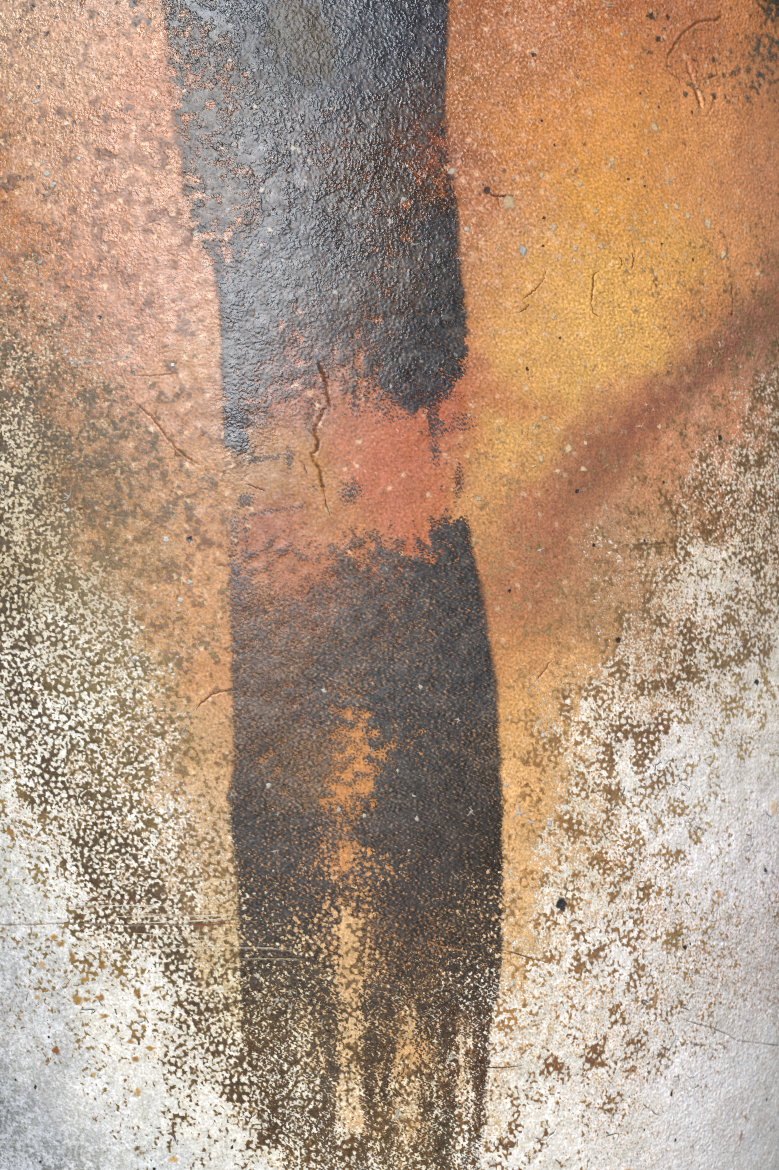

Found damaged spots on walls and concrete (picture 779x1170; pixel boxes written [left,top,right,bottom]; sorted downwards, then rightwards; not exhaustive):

water stain [111,0,468,465]
water stain [742,209,779,276]
crack [306,364,331,515]
water stain [467,416,528,518]
water stain [65,1003,131,1100]
corrosion [542,1055,663,1160]
water stain [577,1090,637,1142]